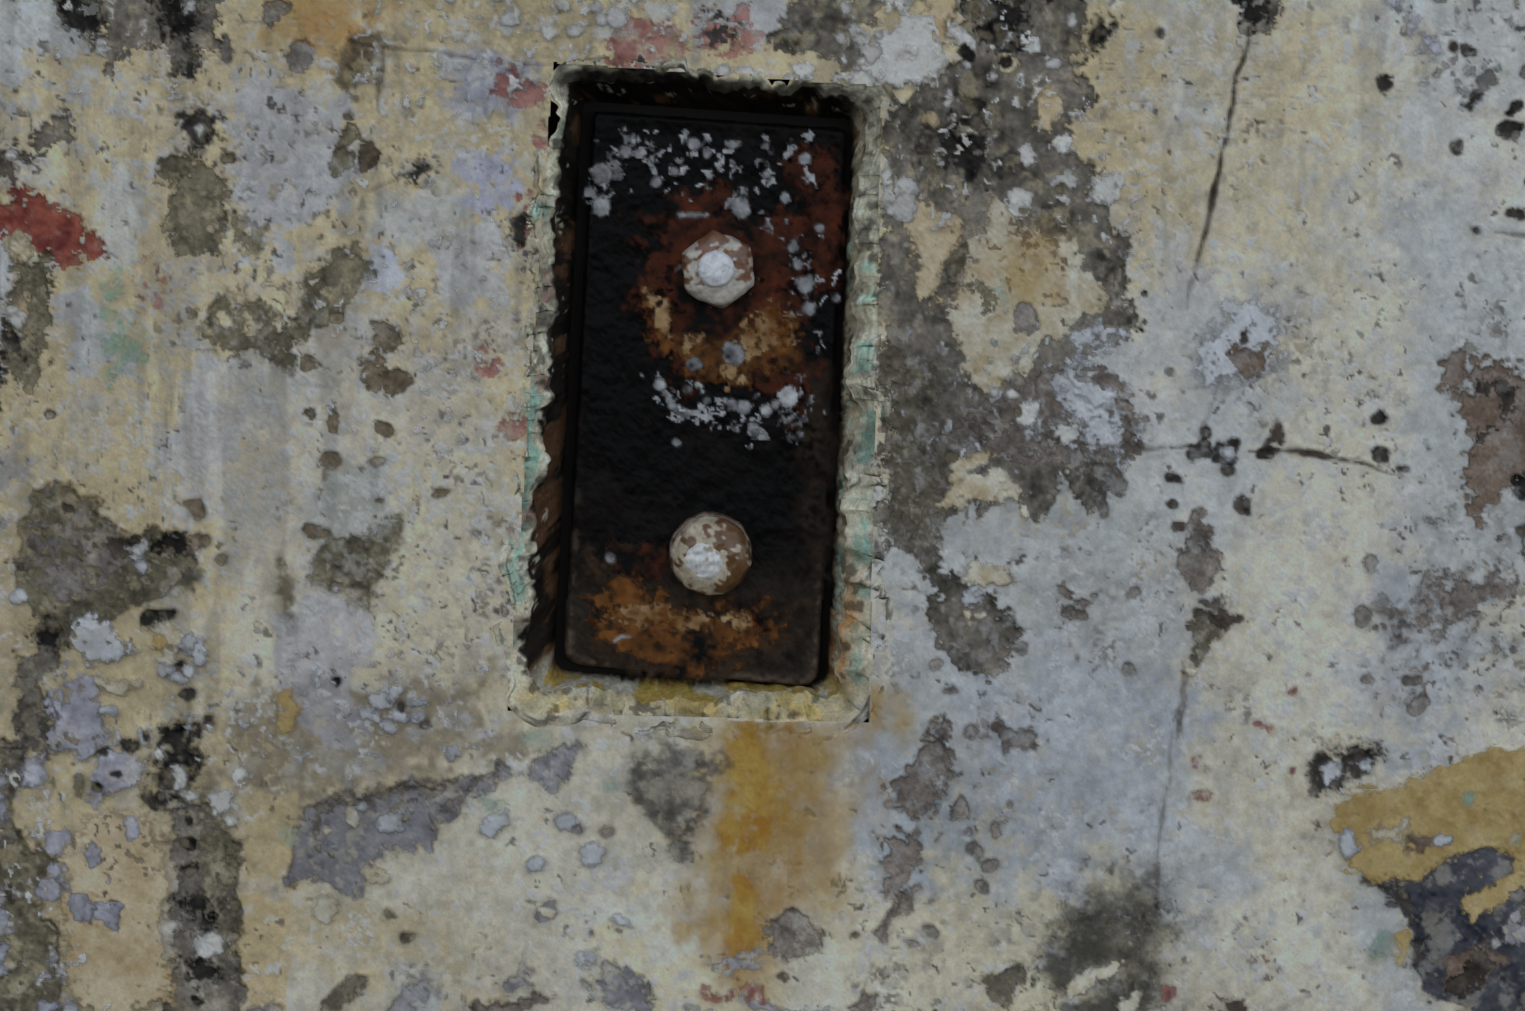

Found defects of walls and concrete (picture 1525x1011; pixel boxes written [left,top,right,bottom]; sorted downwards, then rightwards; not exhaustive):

crack [1196,38,1249,261]
peeling [1460,66,1501,112]
peeling [1496,100,1524,142]
rust [617,142,852,580]
crack [1130,410,1409,472]
peeling [1436,348,1525,530]
rust [580,543,819,685]
peeling [0,480,228,1011]
peeling [163,649,283,1011]
peeling [261,648,606,925]
rust [705,722,798,976]
peeling [1330,743,1525,1011]